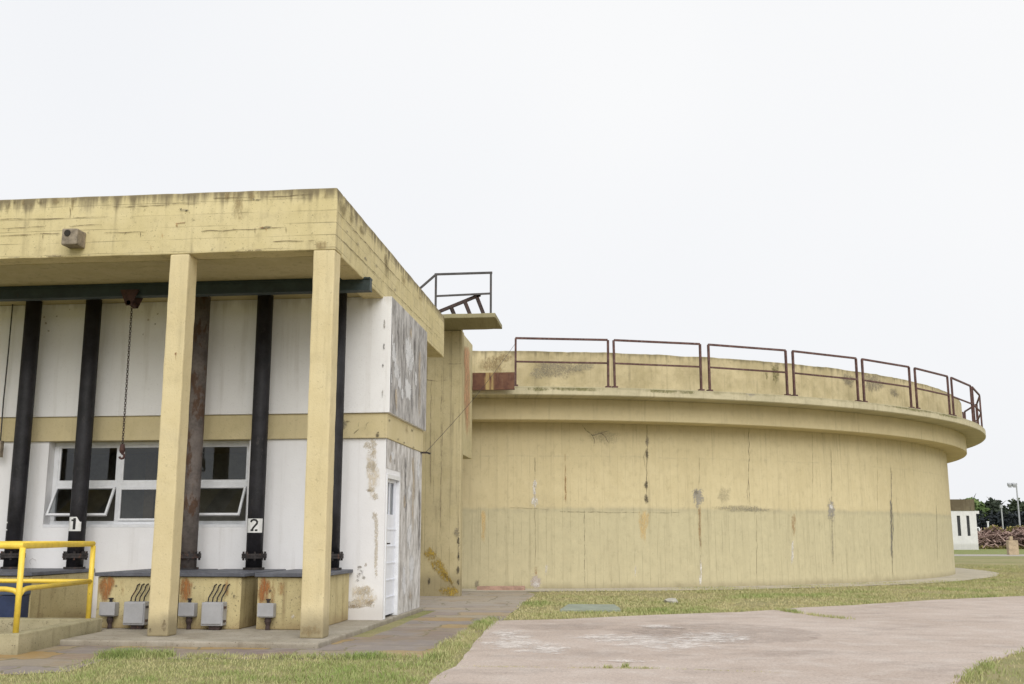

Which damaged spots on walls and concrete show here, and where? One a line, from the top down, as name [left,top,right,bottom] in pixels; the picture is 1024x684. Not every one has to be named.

rust [99,577,116,600]
peeling [364,432,422,614]